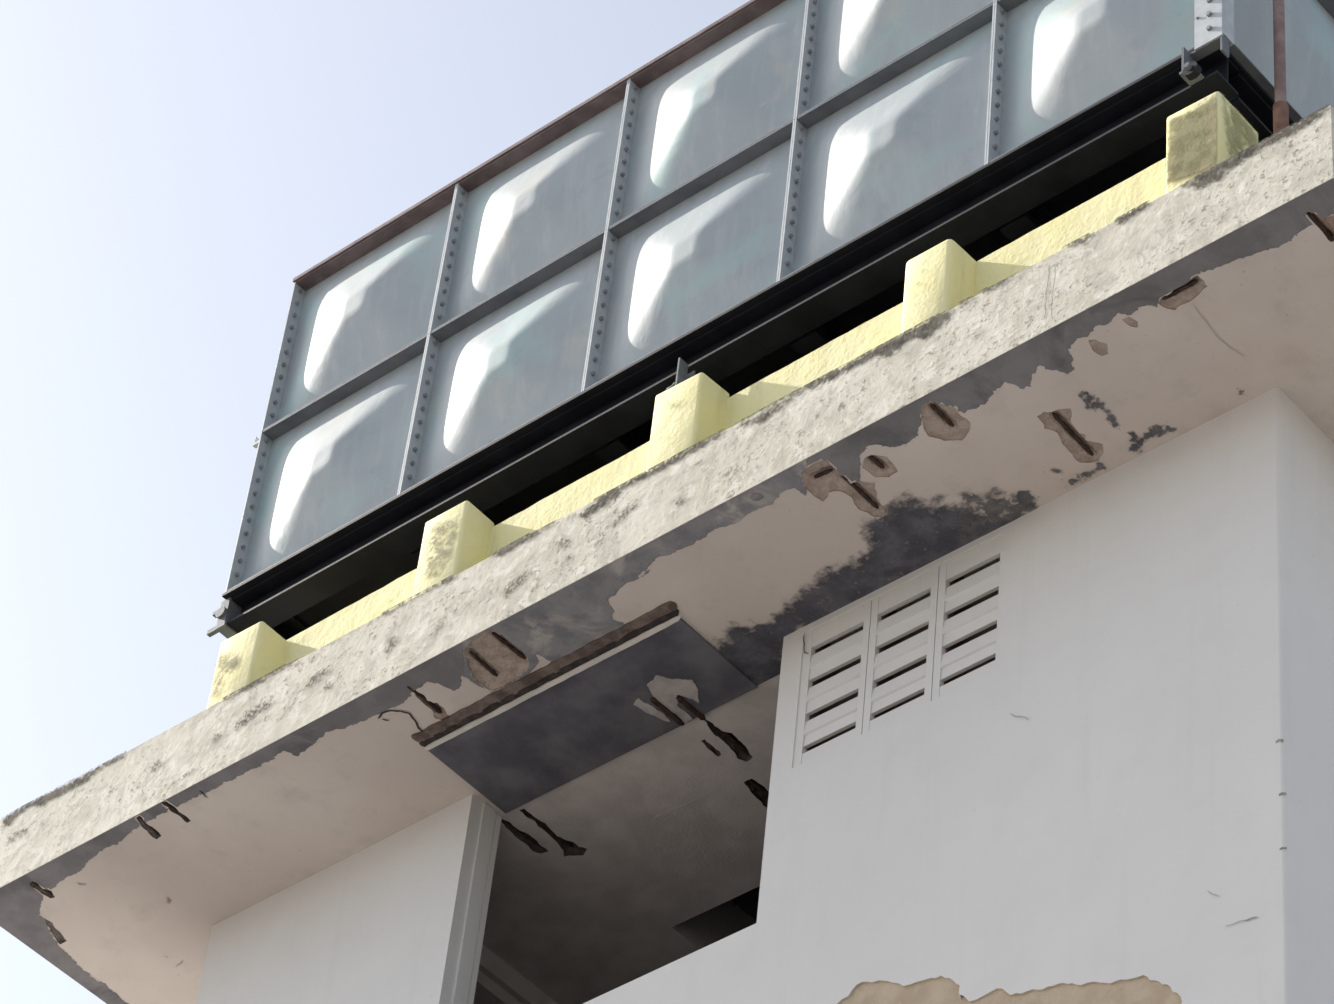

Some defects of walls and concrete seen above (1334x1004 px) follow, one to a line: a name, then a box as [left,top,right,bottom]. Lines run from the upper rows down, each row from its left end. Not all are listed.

peeling [484,179,1334,682]
leakage [719,489,1037,685]
rust [411,601,677,743]
peeling [633,675,752,762]
peeling [0,630,529,1004]
spalling [501,809,587,857]
spalling [744,779,769,807]
flaking render [837,975,1182,1004]